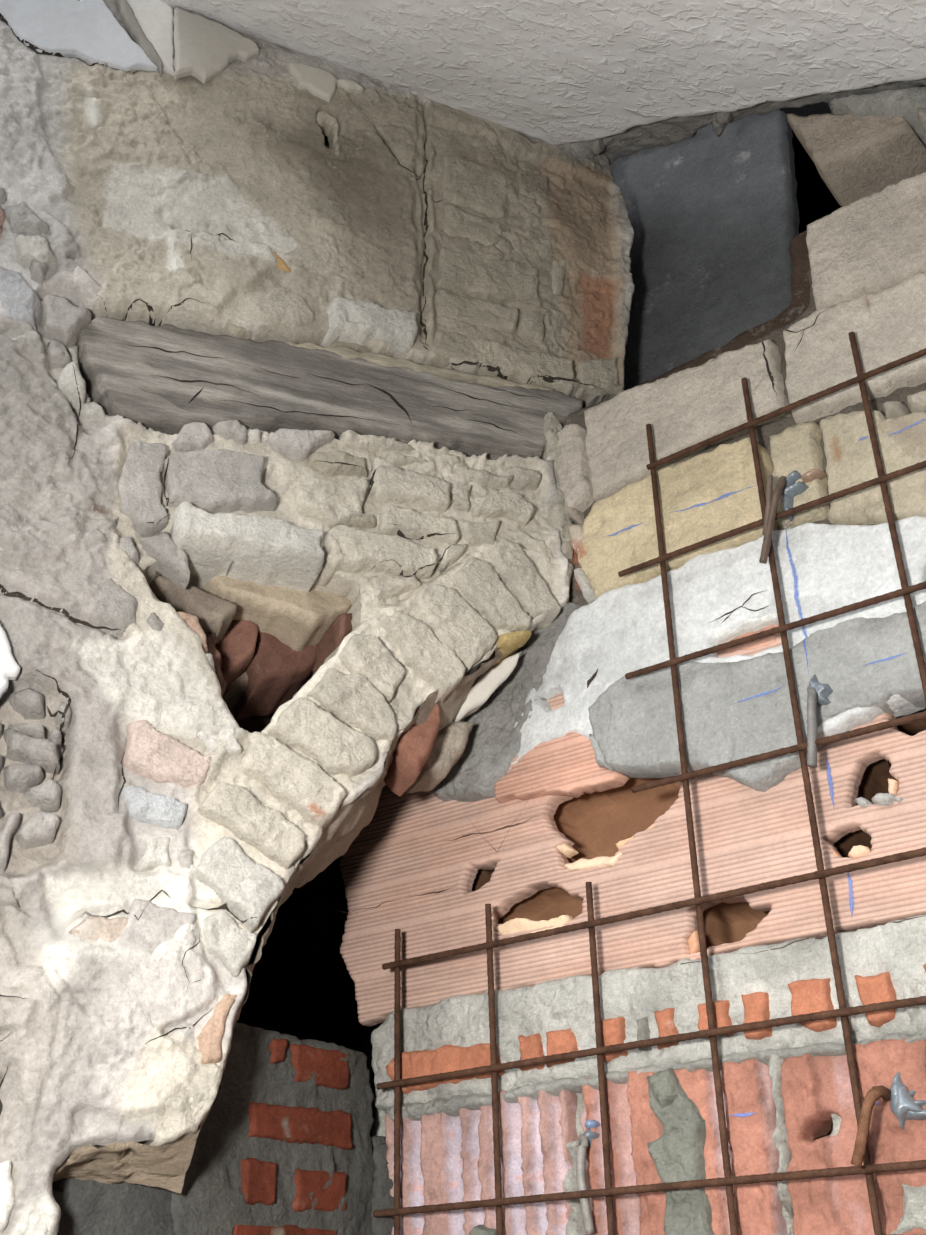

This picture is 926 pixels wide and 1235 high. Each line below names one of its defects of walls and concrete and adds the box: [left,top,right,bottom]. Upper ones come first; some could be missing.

peeling [0,0,259,84]
peeling [286,62,364,103]
crack [0,584,126,632]
crack [710,591,770,623]
spalling [149,575,353,755]
spalling [373,332,926,1235]
peeling [117,899,196,967]